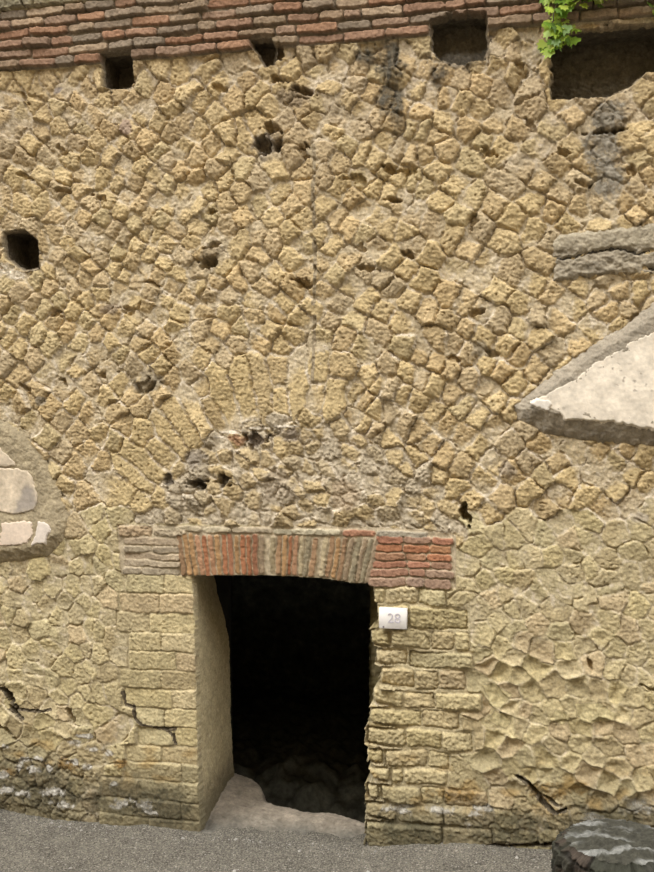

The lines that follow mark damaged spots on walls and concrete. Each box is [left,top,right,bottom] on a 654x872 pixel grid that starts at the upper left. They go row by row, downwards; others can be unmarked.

crack [0,687,52,720]
crack [121,691,177,745]
crack [515,774,567,815]